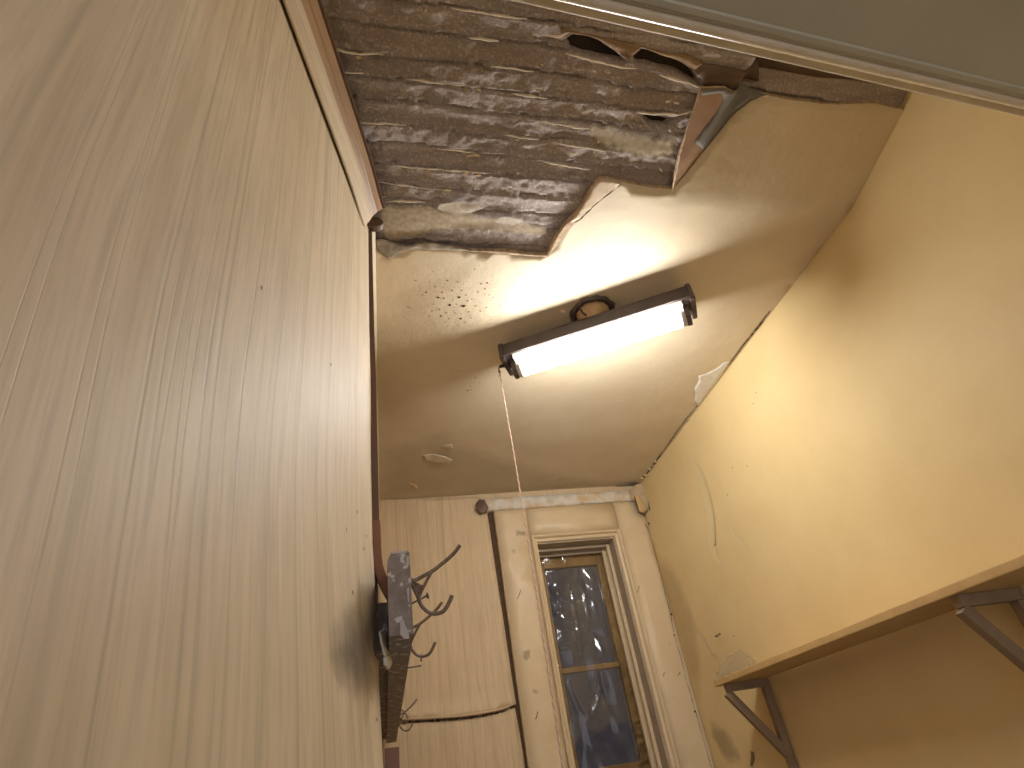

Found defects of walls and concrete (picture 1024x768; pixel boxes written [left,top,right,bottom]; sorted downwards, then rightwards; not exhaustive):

spalling [322,0,908,252]
peeling [690,360,730,406]